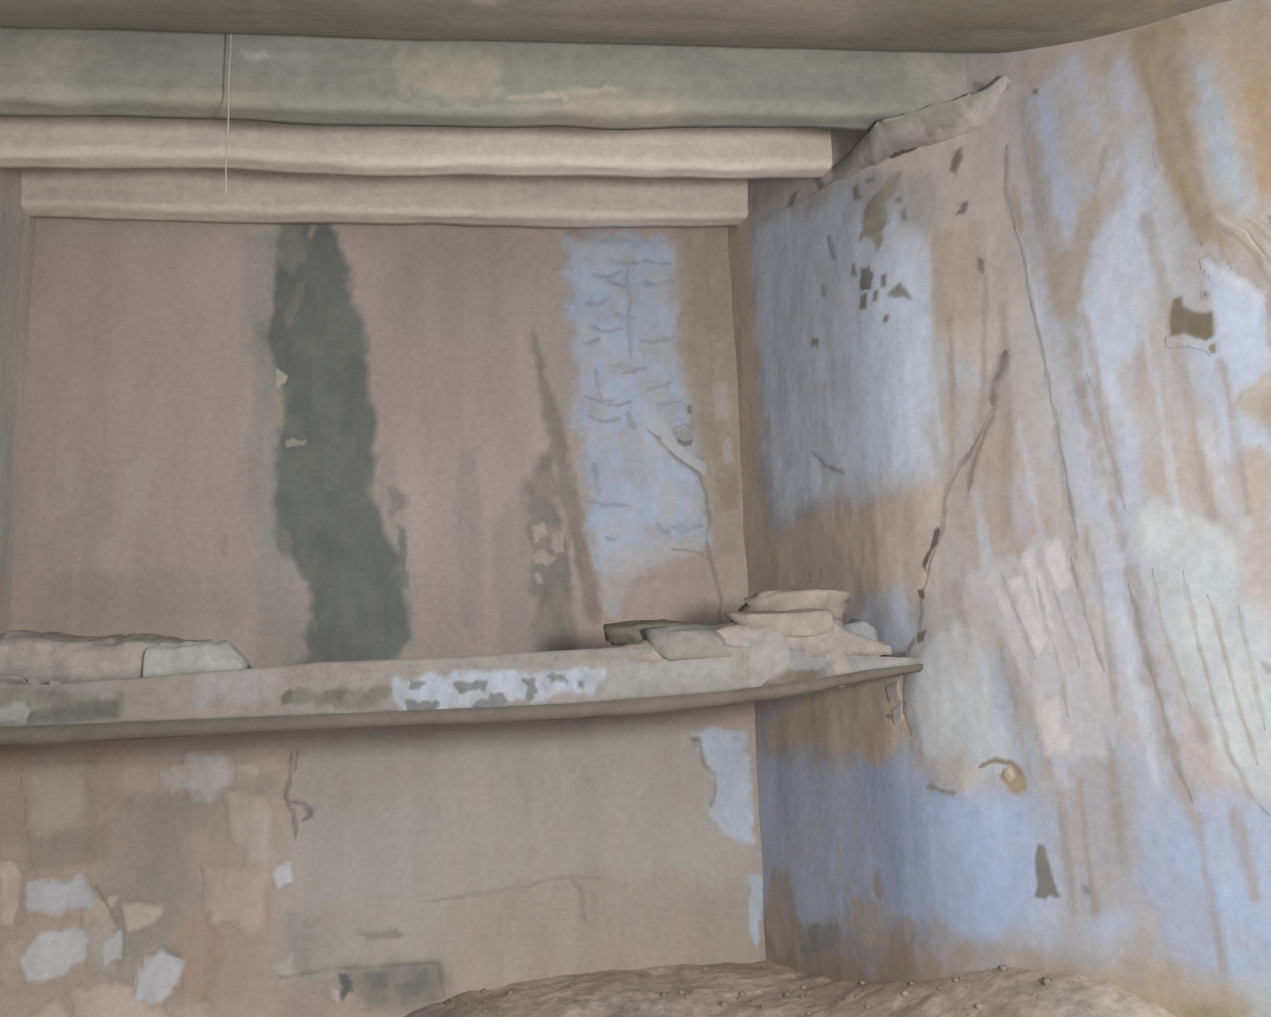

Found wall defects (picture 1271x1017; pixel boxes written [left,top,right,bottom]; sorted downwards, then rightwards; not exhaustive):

peeling [850,166,915,326]
peeling [1166,255,1271,393]
leakage [232,224,416,666]
peeling [556,227,713,623]
crack [886,145,1078,736]
peeling [390,663,609,711]
peeling [21,760,91,846]
peeling [0,858,210,1017]
peeling [159,748,295,938]
crack [280,748,315,842]
peeling [687,723,759,847]
flaking render [1032,840,1063,902]